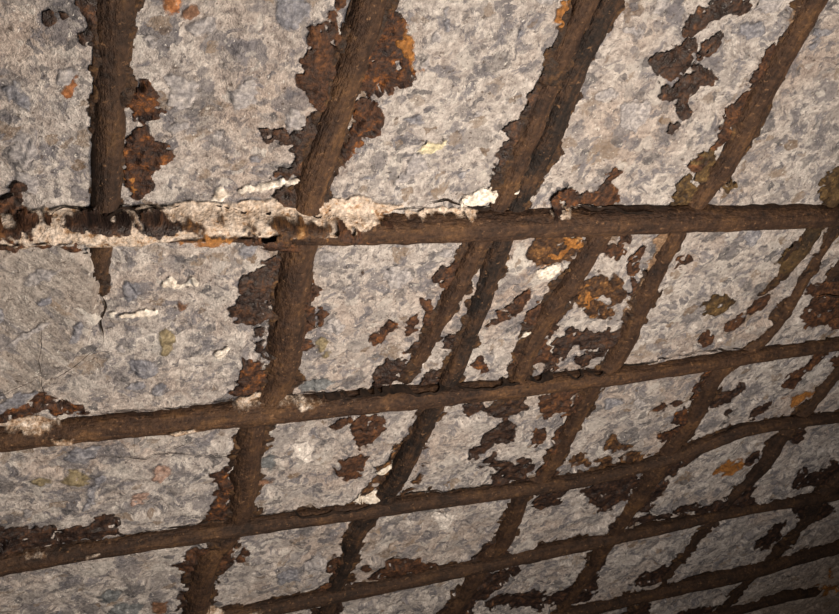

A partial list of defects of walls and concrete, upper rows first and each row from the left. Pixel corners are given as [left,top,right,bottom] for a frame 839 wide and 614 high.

corrosion [0,0,233,254]
corrosion [227,0,370,401]
corrosion [324,0,424,211]
spalling [0,0,839,398]
water stain [460,187,498,208]
corrosion [488,0,574,195]
corrosion [648,0,753,135]
corrosion [369,241,493,388]
corrosion [486,237,587,378]
corrosion [295,409,425,511]
spalling [0,236,839,614]
corrosion [463,371,711,488]